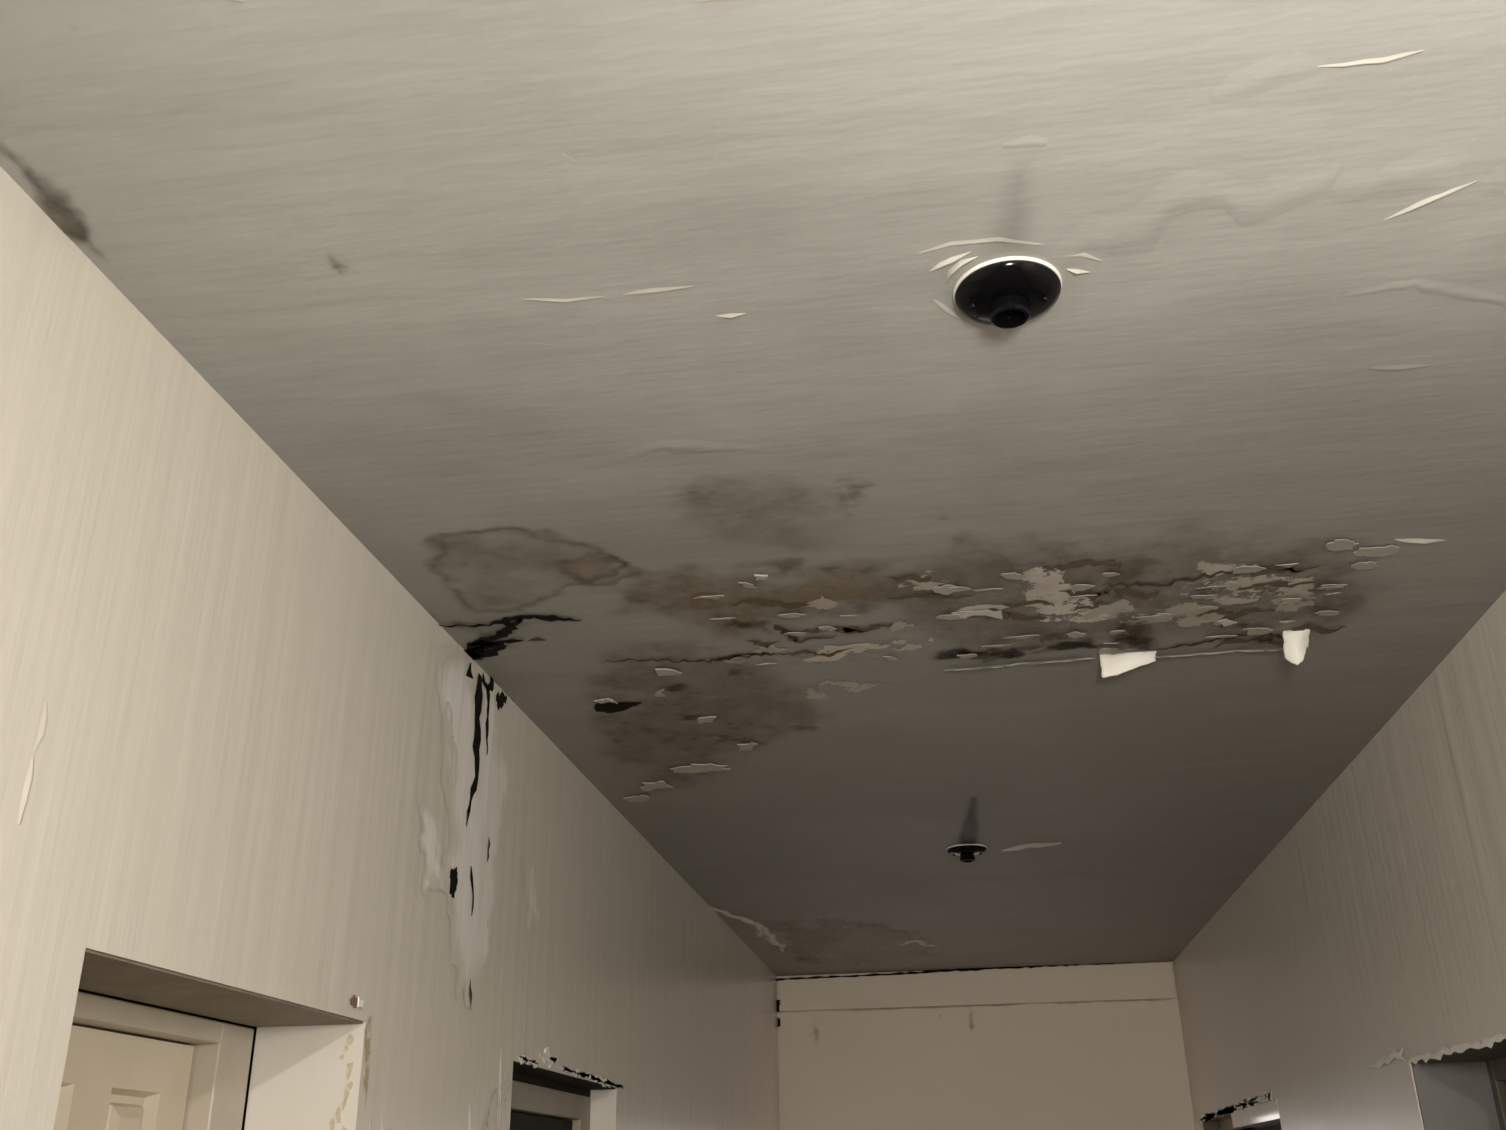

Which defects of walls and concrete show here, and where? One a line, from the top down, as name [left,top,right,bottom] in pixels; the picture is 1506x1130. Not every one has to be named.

water stain [38,186,87,241]
water stain [635,564,918,643]
water stain [710,653,765,662]
peeling [593,538,1446,802]
crack [439,615,581,916]